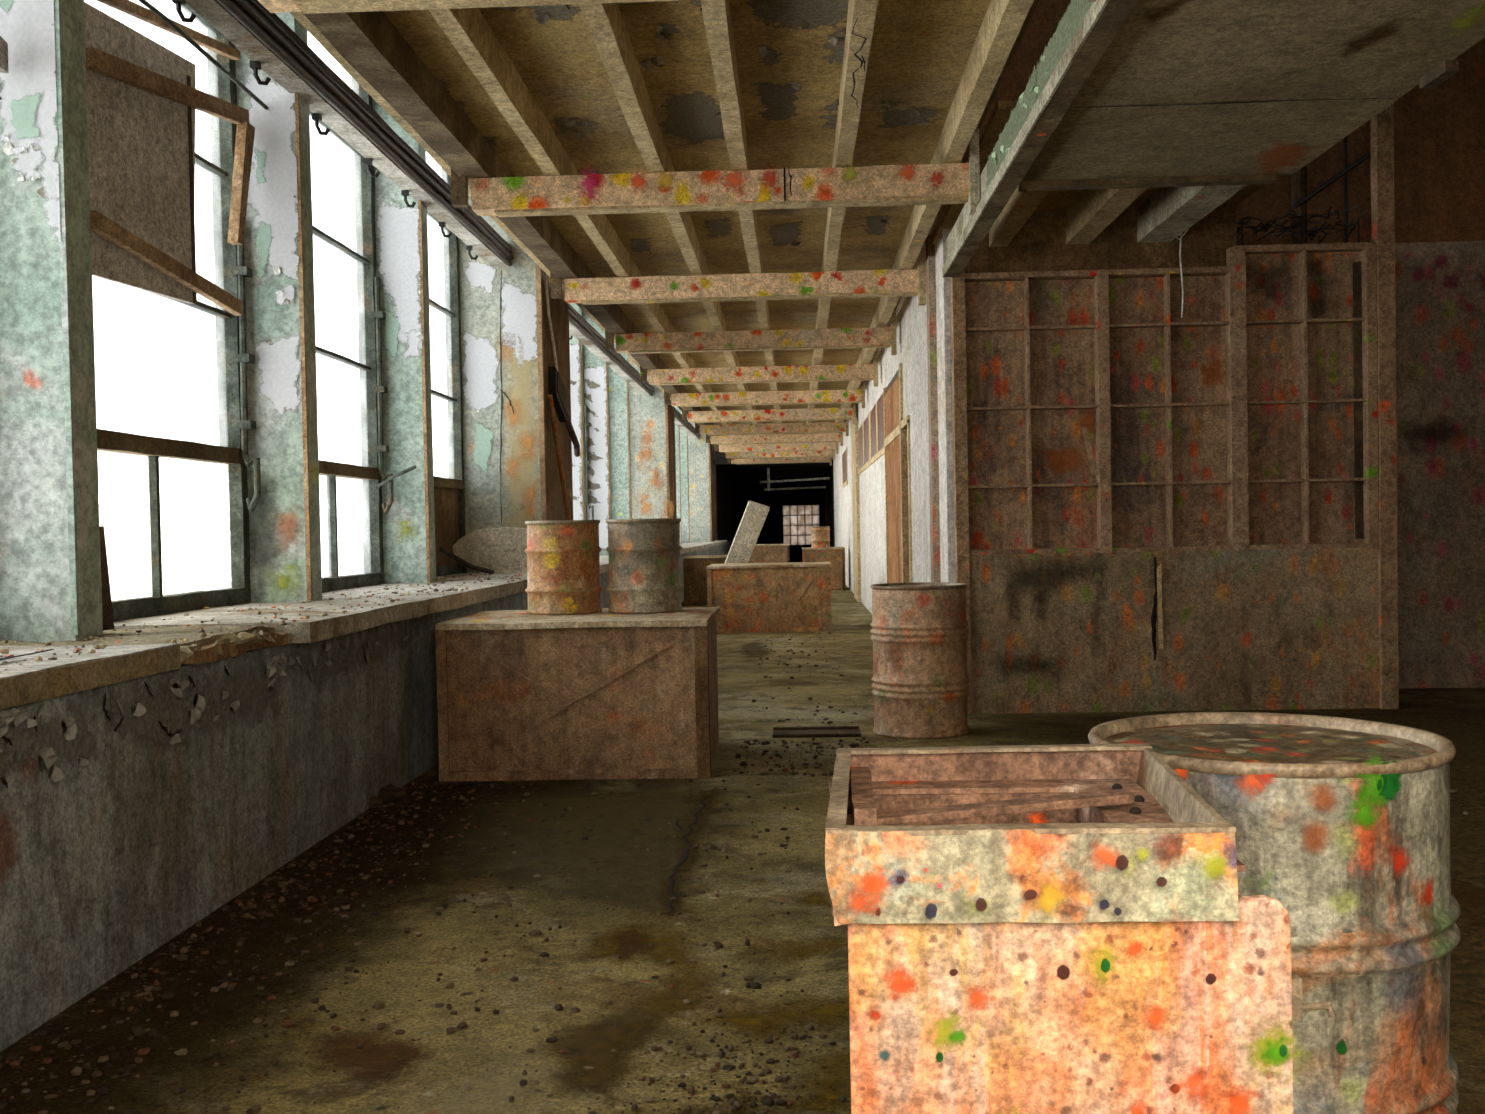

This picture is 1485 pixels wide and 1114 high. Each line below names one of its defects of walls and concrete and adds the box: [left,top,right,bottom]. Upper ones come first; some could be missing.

peeling [0,0,61,244]
peeling [242,74,299,305]
peeling [255,333,302,417]
peeling [461,261,537,474]
crack [1151,557,1163,660]